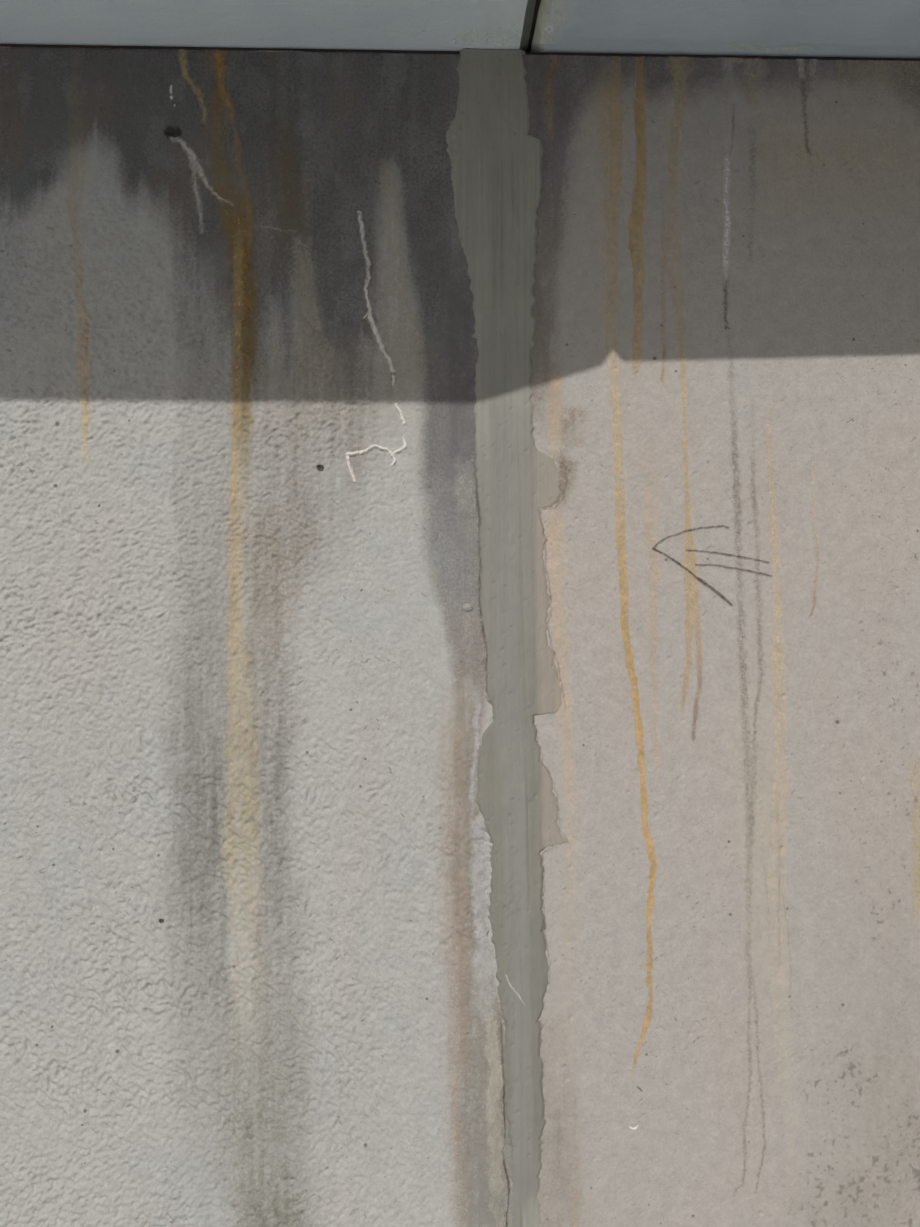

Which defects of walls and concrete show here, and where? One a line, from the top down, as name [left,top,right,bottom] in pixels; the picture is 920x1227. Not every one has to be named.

rust [215,131,255,463]
crack [346,216,406,482]
rust [604,56,646,367]
damp [0,47,512,1227]
rust [613,452,657,1064]